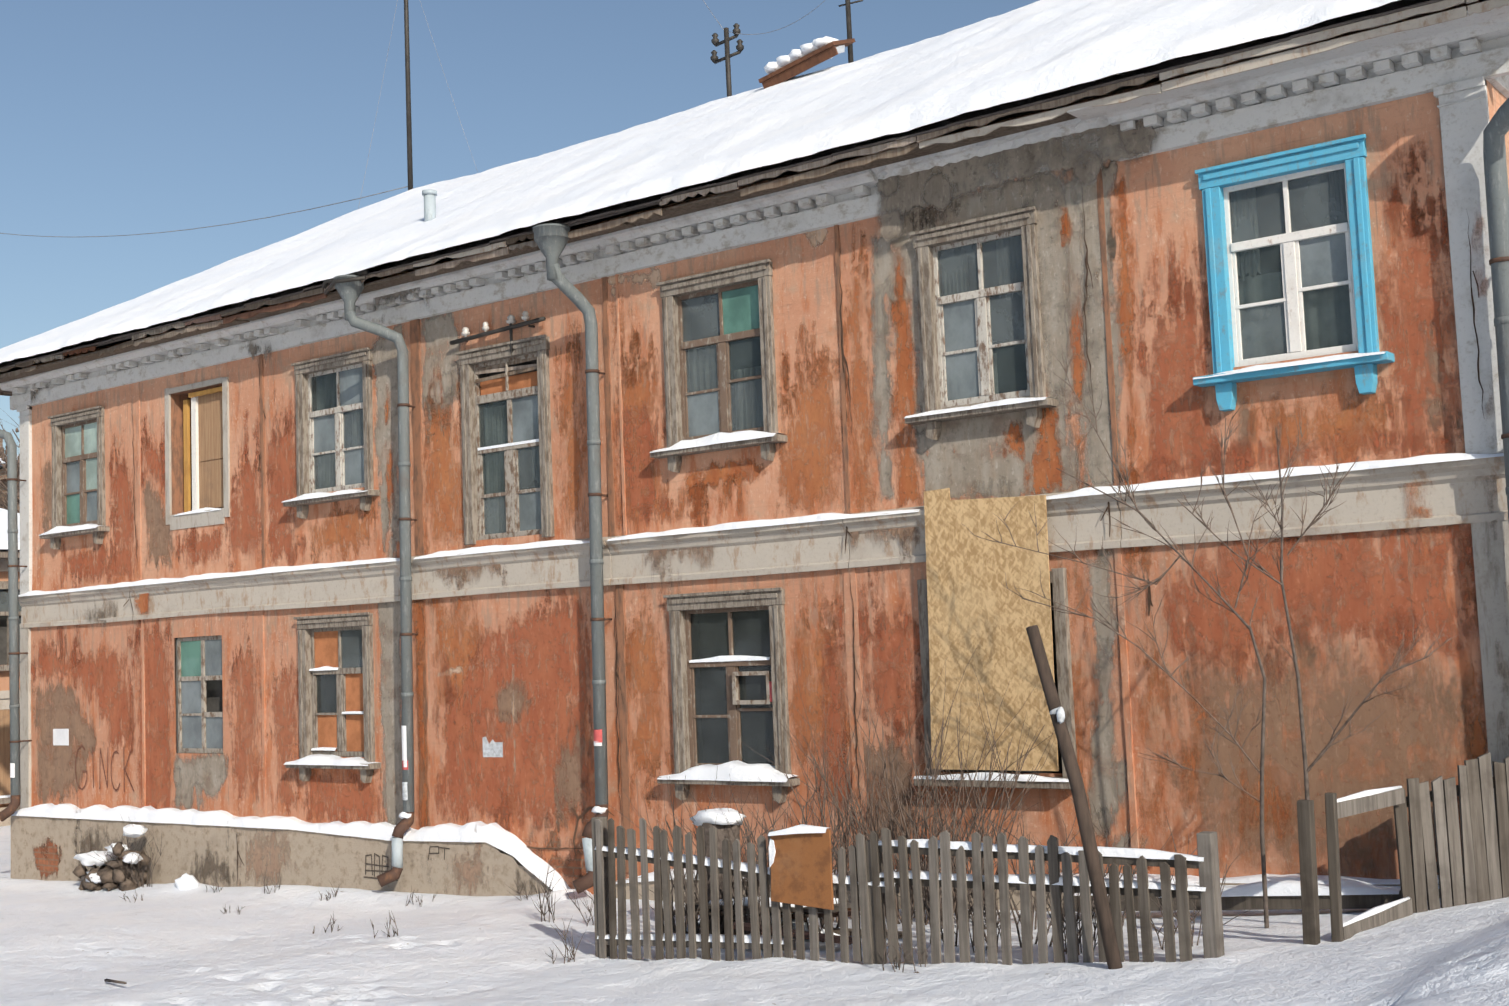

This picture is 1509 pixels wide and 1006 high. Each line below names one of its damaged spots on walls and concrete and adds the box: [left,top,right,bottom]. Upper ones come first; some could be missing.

spalling [176,320,403,567]
peeling [421,297,464,554]
peeling [614,322,687,531]
crack [1081,185,1094,412]
spalling [779,119,1460,511]
spalling [31,601,403,825]
peeling [432,588,593,880]
spalling [1067,546,1169,848]
peeling [1138,524,1478,739]
flaking render [33,838,62,879]